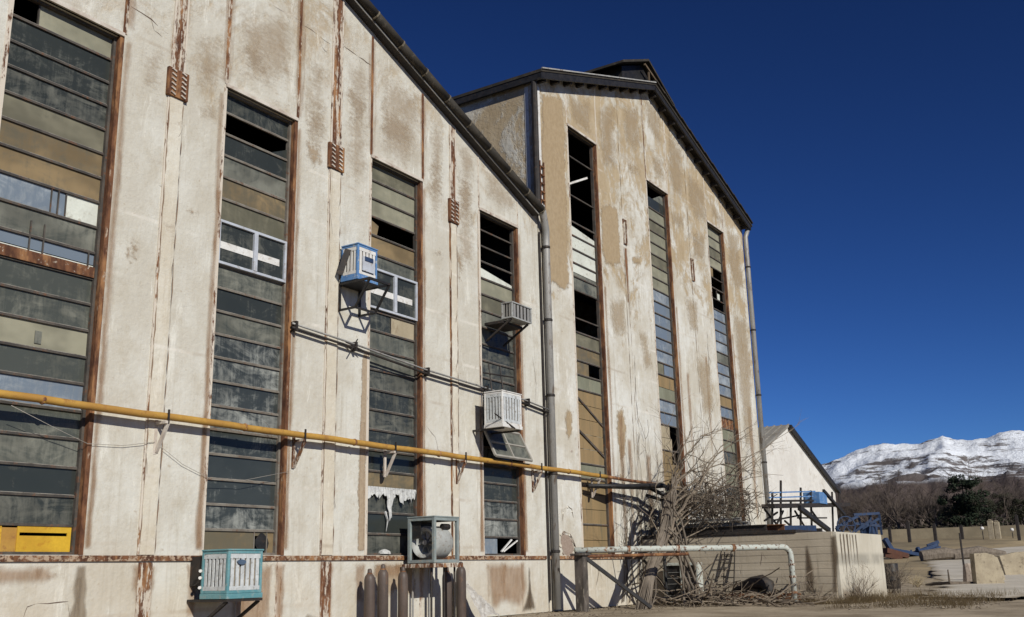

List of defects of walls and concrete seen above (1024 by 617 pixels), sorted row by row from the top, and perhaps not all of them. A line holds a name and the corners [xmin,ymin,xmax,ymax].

water stain [525,579,534,609]